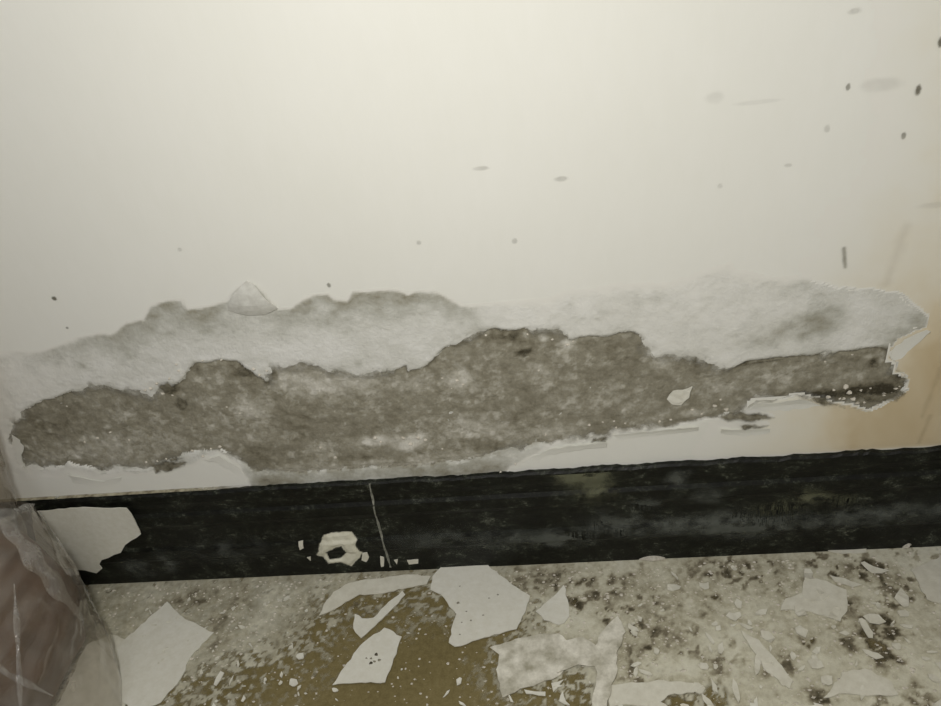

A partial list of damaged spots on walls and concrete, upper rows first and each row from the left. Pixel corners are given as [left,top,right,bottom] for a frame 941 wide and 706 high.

spalling [0,261,931,487]
damp [692,0,941,460]